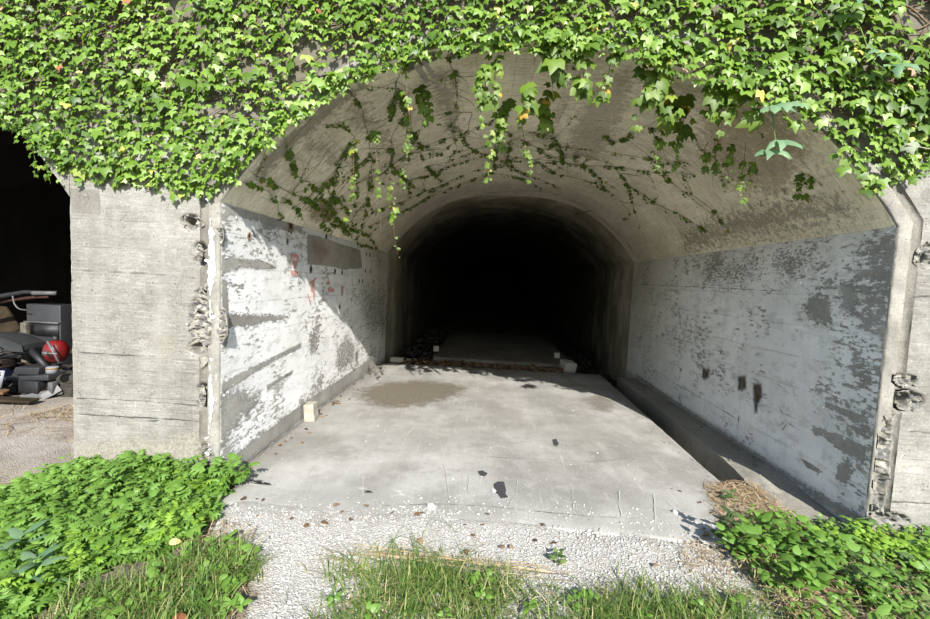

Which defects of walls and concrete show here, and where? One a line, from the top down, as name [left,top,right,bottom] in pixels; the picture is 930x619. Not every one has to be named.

peeling [699,228,895,330]
spalling [913,241,930,271]
peeling [182,205,389,475]
leakage [359,381,463,407]
spalling [636,372,926,526]